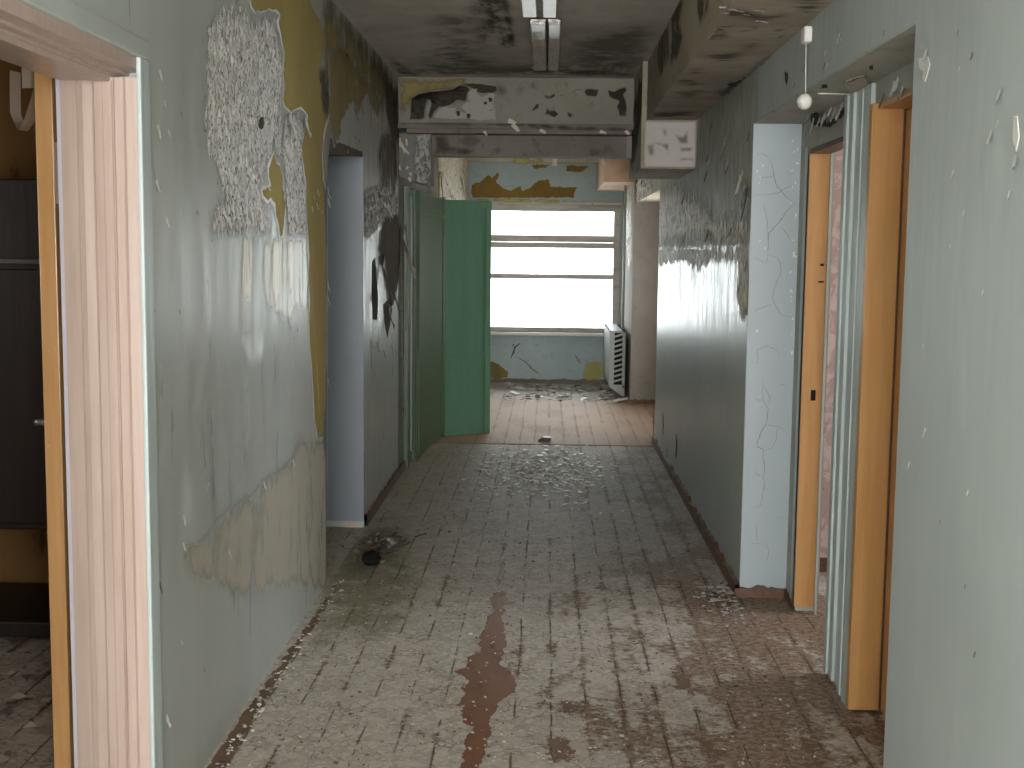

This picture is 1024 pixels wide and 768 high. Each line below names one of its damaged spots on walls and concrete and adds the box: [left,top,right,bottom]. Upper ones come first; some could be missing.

flaking render [584,87,627,117]
peeling [626,137,766,322]
crack [753,153,796,317]
peeling [183,0,580,768]
crack [751,384,784,563]
peeling [536,663,591,720]